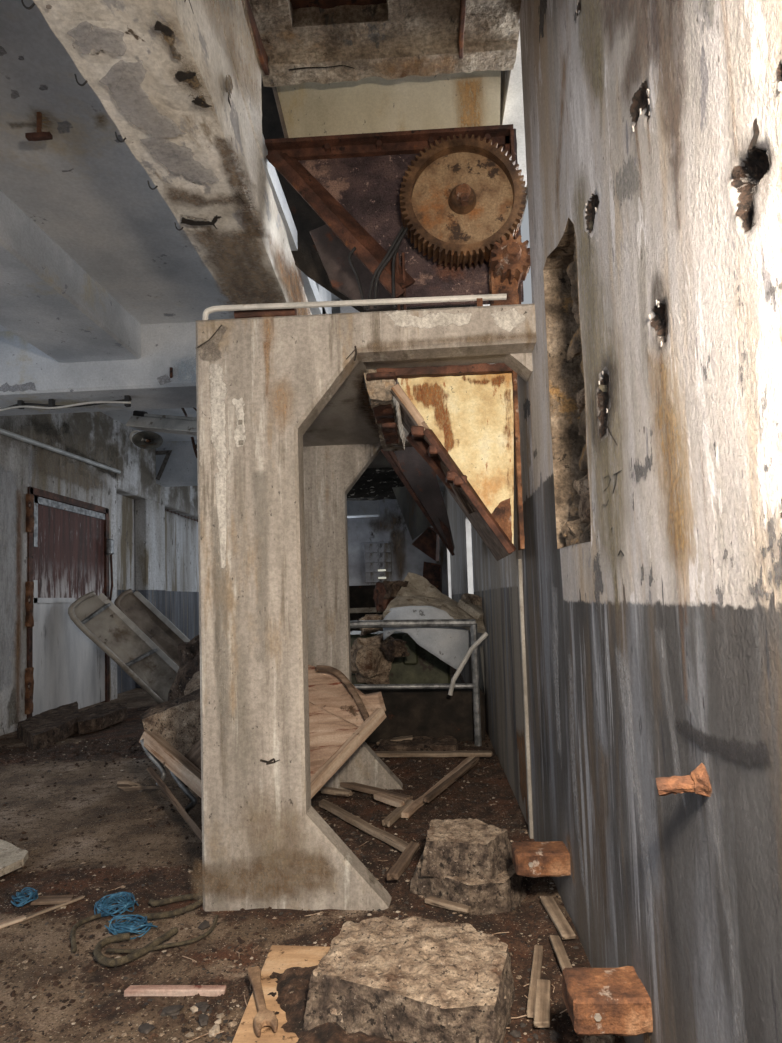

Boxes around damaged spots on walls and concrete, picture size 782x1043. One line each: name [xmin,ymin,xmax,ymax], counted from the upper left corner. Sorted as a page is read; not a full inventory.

leakage [579,0,683,224]
spalling [630,81,651,137]
spalling [728,119,772,232]
leakage [168,137,287,312]
spalling [585,193,599,244]
spalling [648,275,668,350]
corrosion [413,383,459,452]
corrosion [462,375,510,400]
spalling [592,362,617,447]
corrosion [655,363,686,556]
corrosion [491,488,514,542]
peeling [749,499,782,602]